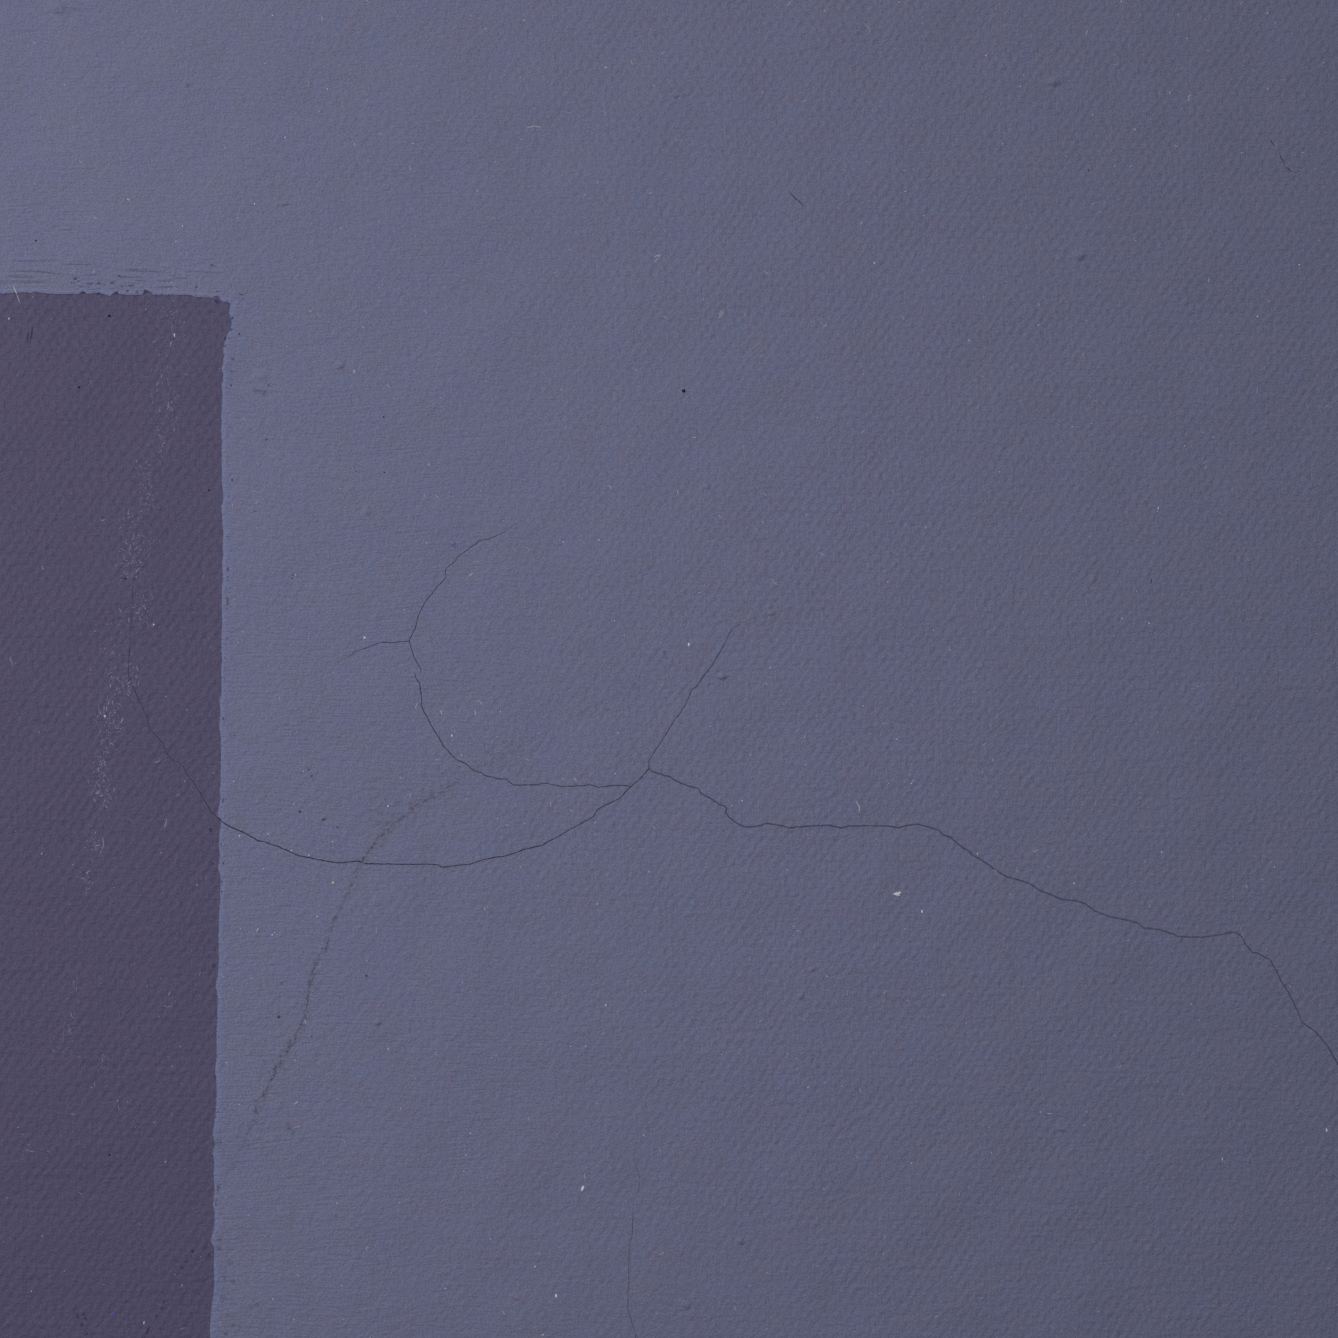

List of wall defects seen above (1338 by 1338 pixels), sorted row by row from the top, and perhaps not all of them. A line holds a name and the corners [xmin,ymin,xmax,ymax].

crack [376,577,608,787]
crack [217,817,551,867]